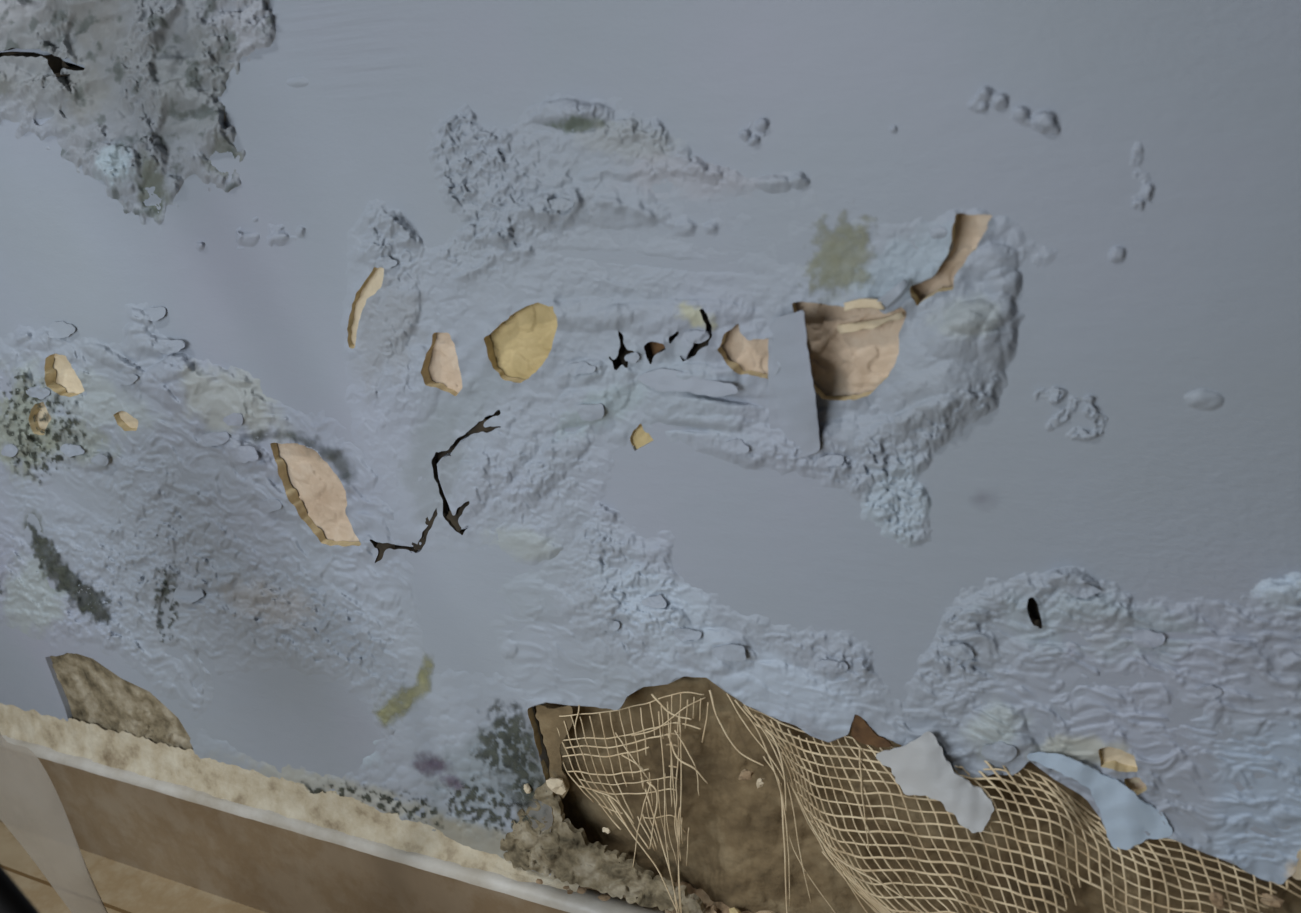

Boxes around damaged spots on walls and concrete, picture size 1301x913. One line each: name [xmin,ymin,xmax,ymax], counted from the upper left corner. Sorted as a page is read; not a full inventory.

crack [0,52,85,69]
flaking render [351,267,384,345]
flaking render [722,213,992,458]
crack [436,410,500,465]
crack [376,501,469,562]
flaking render [0,302,1301,913]